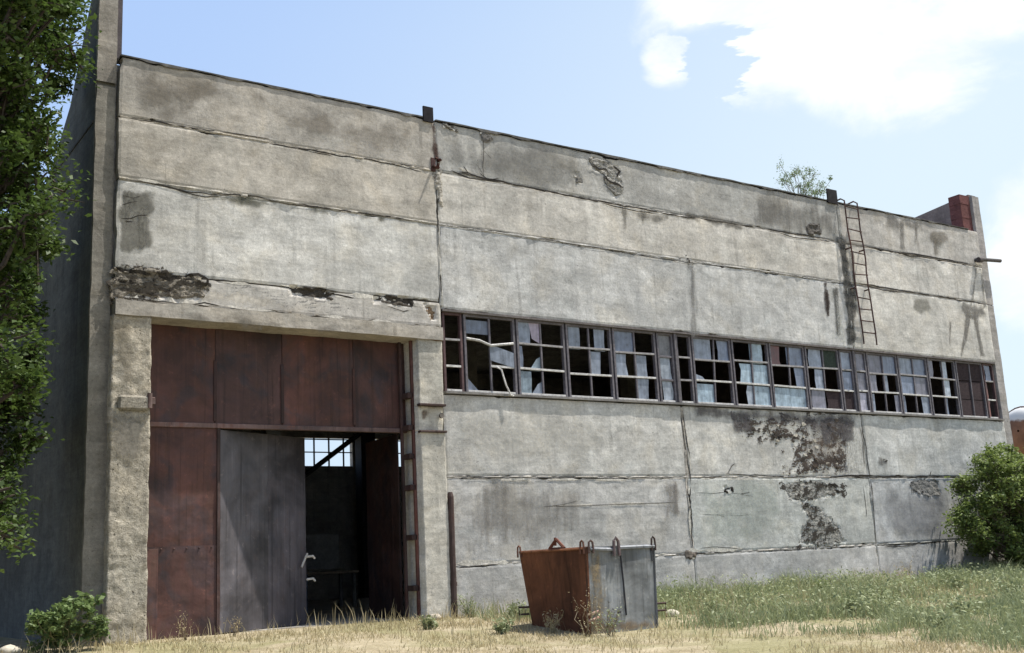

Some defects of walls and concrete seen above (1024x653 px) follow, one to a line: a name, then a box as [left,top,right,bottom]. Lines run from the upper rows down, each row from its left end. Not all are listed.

leakage [119,191,154,251]
crack [119,118,982,304]
spalling [589,157,624,196]
spalling [106,264,212,304]
spalling [229,284,349,313]
spalling [373,295,413,311]
leakage [833,238,857,344]
leakage [961,281,985,355]
crack [460,416,958,556]
peeling [734,408,848,550]